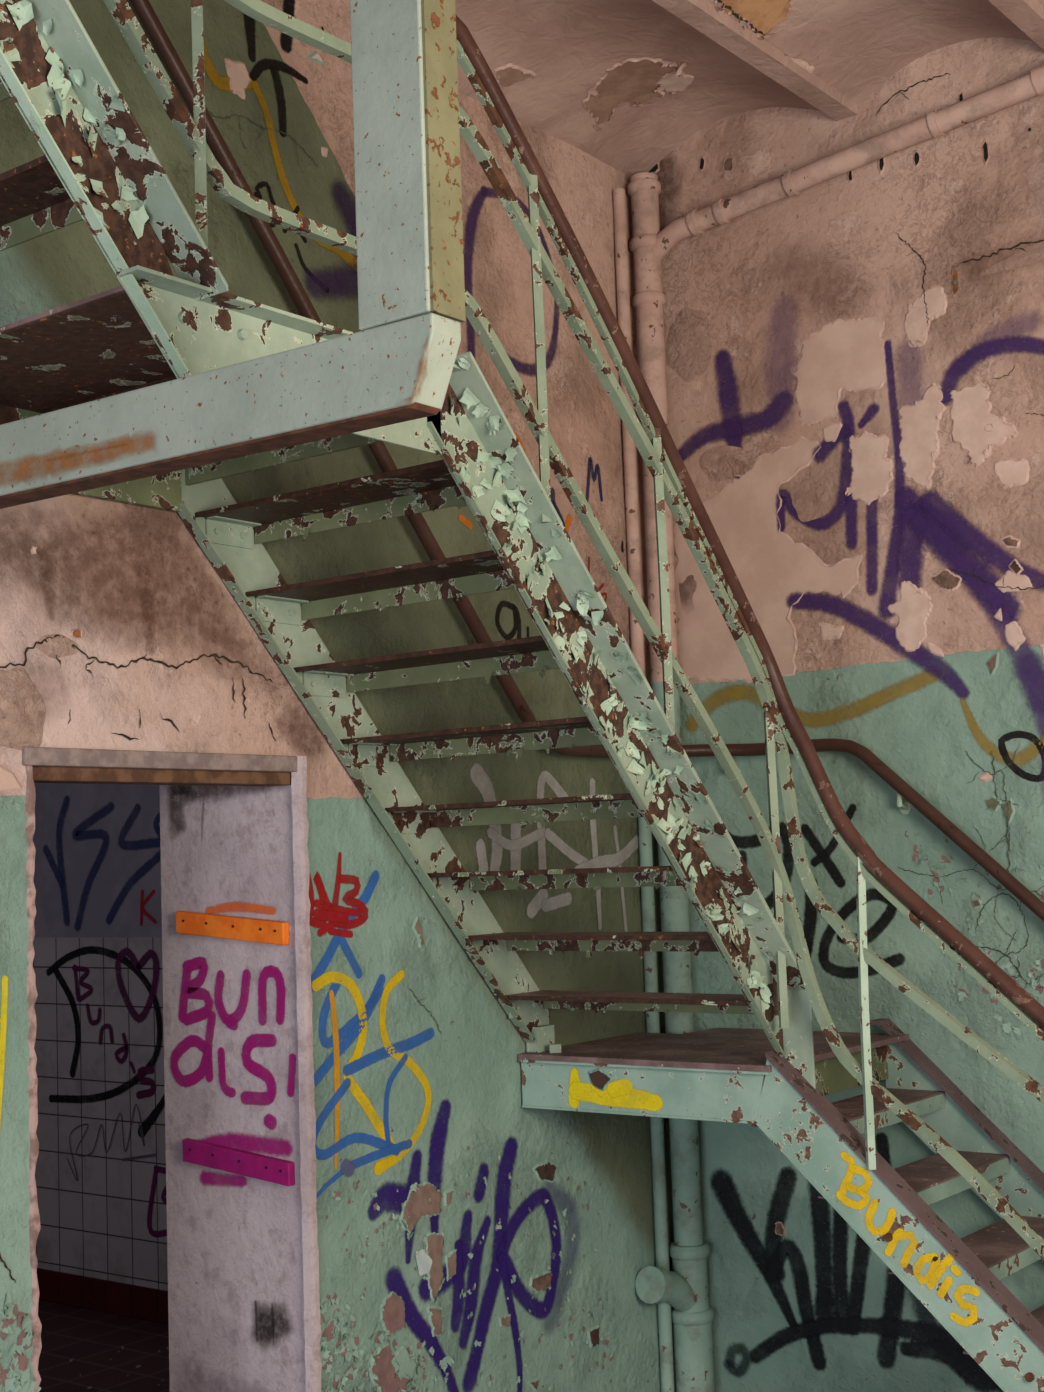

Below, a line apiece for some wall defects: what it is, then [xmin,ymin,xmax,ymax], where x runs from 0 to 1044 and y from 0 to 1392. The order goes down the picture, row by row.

peeling [0,0,84,125]
spalling [713,0,793,39]
peeling [72,94,149,239]
peeling [903,266,961,348]
crack [897,233,1044,327]
peeling [455,448,532,557]
peeling [702,317,1030,676]
crack [0,634,272,681]
peeling [673,517,753,683]
crack [949,568,1040,590]
peeling [535,589,774,1012]
peeling [320,1172,531,1392]